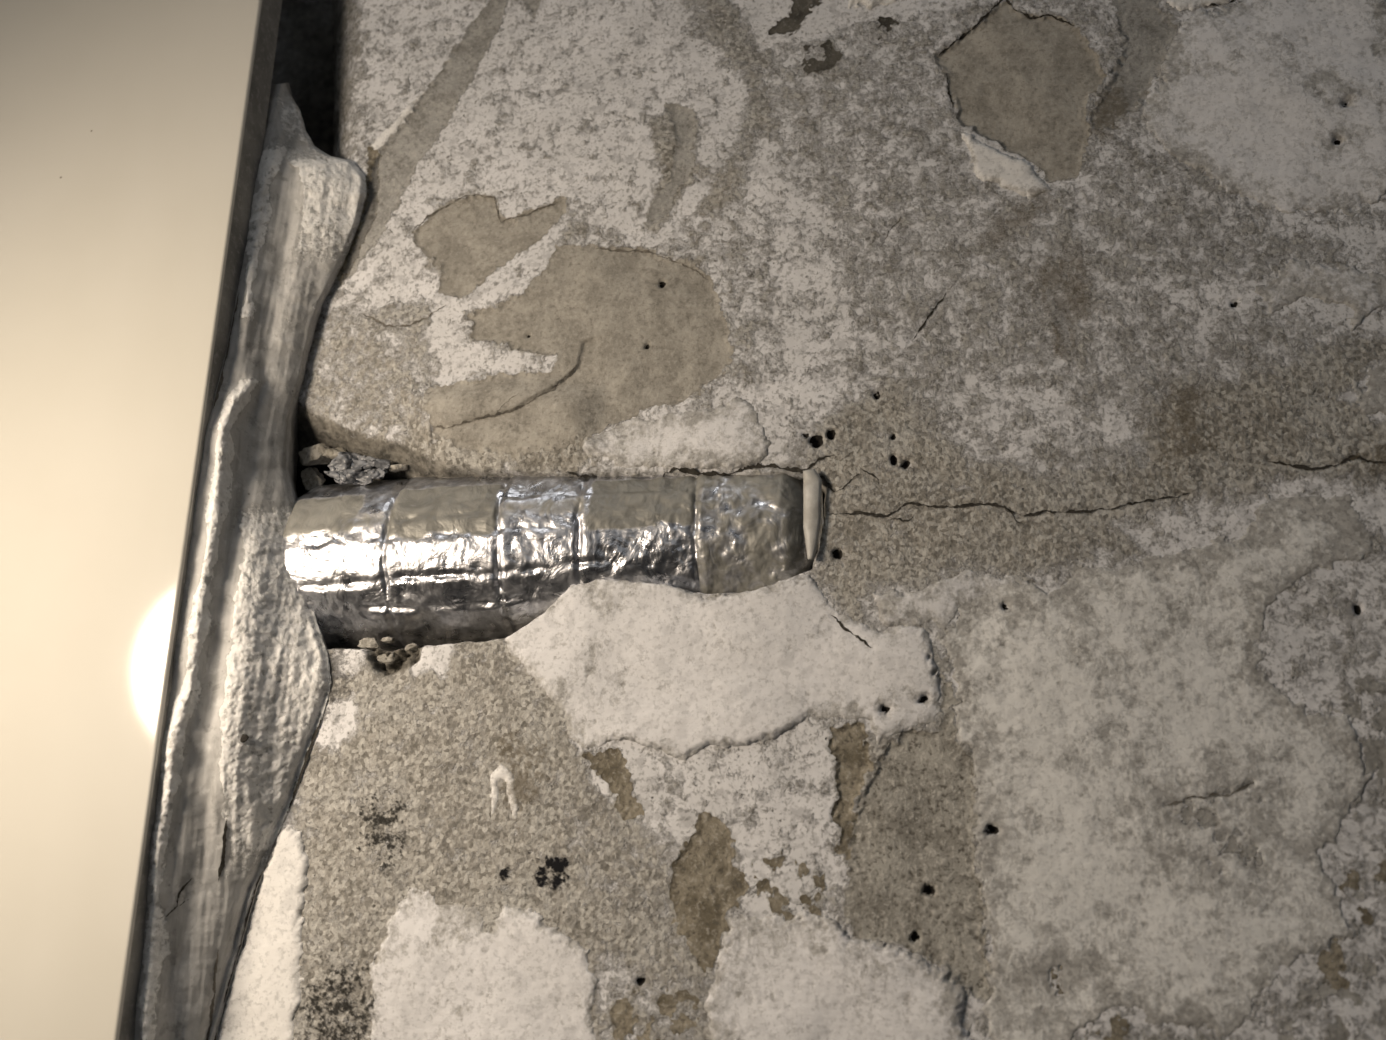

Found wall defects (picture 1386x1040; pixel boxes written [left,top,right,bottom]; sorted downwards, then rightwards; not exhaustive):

peeling [768,0,843,74]
flaking render [848,0,900,41]
peeling [336,0,508,288]
flaking render [936,0,1386,217]
peeling [412,195,772,473]
crack [569,471,596,479]
crack [663,455,1189,527]
crack [1268,455,1386,470]
flaking render [367,493,1386,1040]